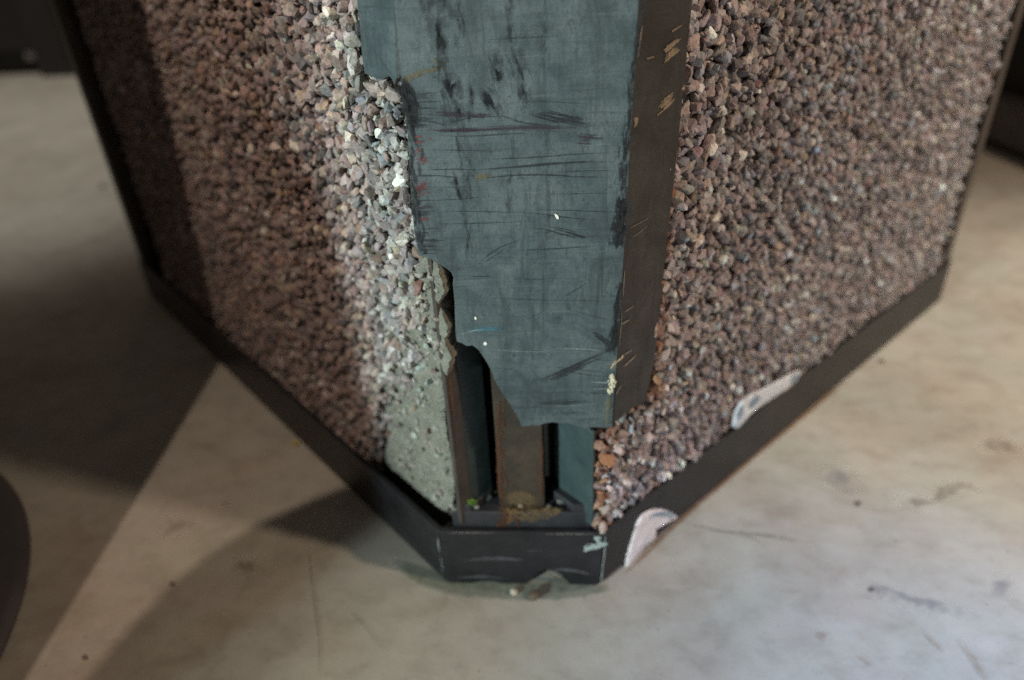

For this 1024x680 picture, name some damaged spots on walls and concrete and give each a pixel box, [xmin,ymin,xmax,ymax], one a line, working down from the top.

corrosion [496,397,561,528]